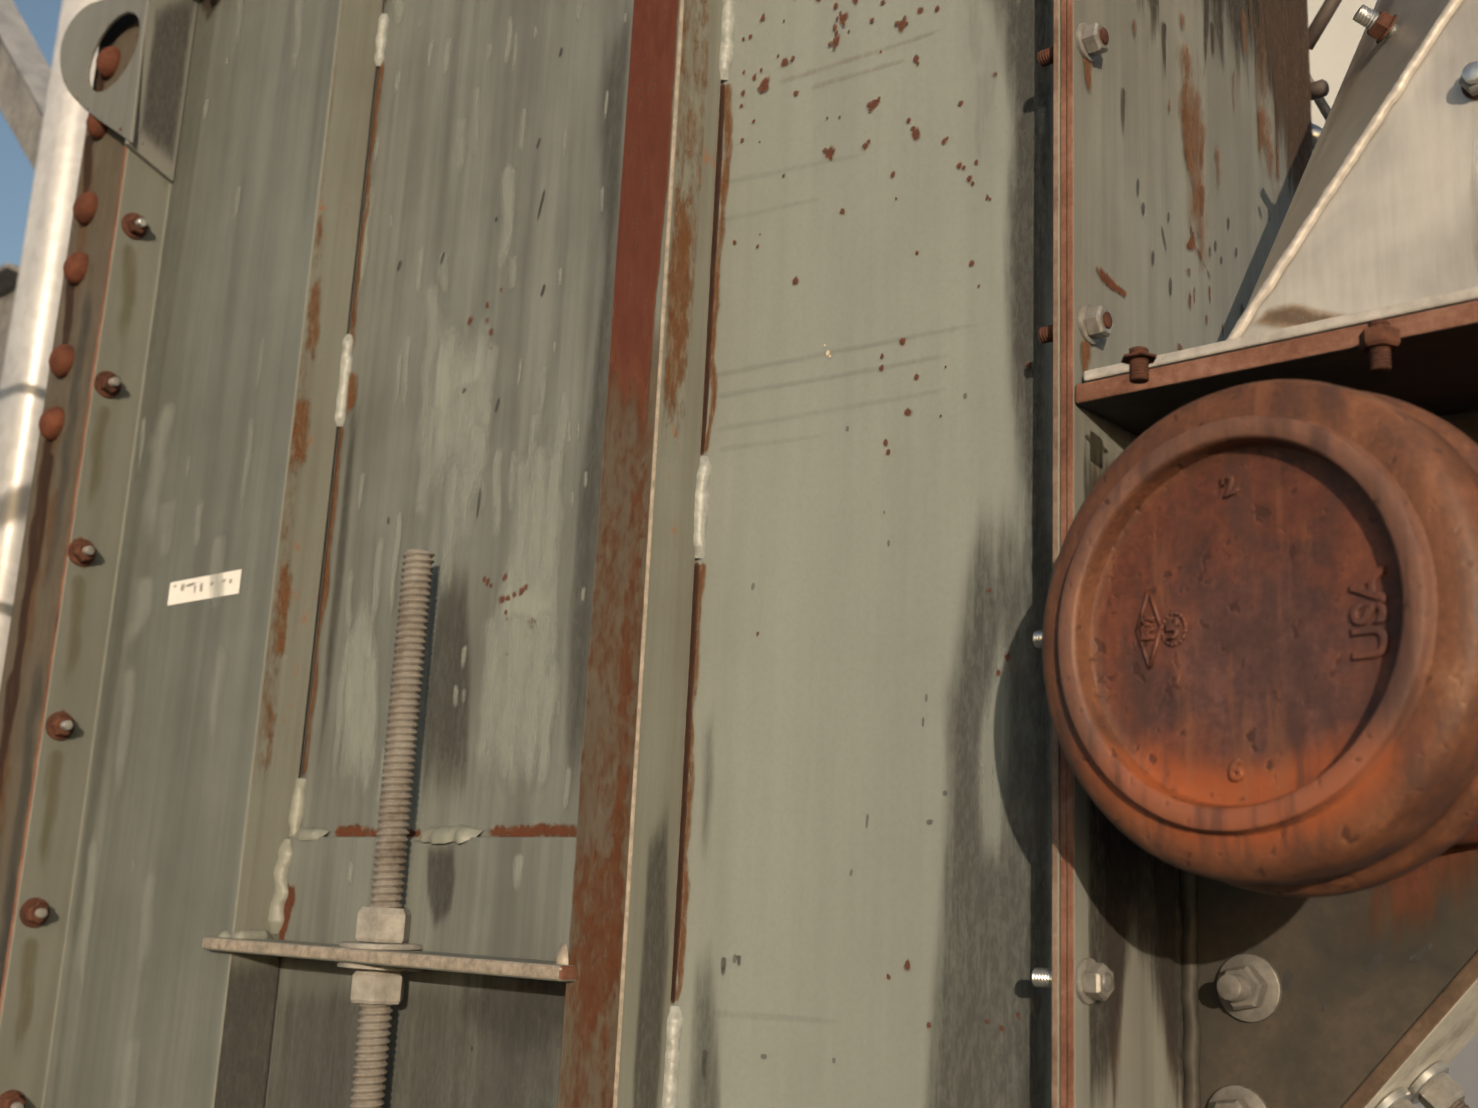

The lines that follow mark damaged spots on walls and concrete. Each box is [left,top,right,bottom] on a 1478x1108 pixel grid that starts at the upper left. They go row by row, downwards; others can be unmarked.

corrosion [816,0,858,50]
corrosion [894,6,940,32]
leakage [1150,0,1166,69]
leakage [1205,0,1313,192]
corrosion [83,134,94,193]
corrosion [1169,47,1223,334]
corrosion [62,282,75,344]
corrosion [570,0,795,1108]
leakage [936,0,1051,1108]
corrosion [0,439,54,796]
corrosion [335,824,379,837]
corrosion [490,823,577,837]